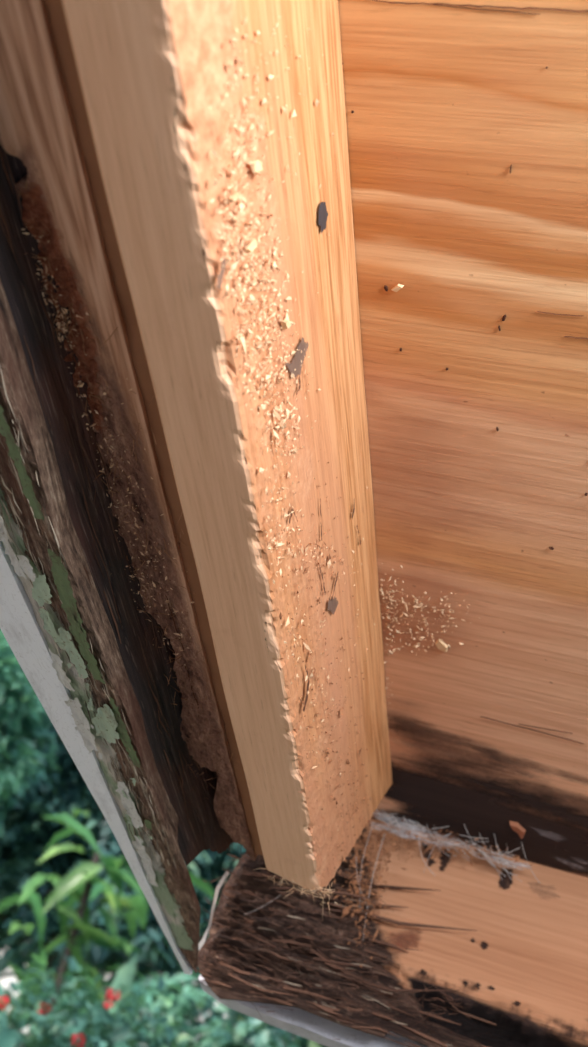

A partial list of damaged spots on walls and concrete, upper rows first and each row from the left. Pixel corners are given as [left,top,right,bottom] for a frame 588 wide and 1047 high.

crack [373,0,588,15]
peeling [0,405,45,521]
peeling [0,516,158,887]
leakage [379,717,588,889]
leakage [416,969,495,1007]
leakage [507,1001,587,1038]